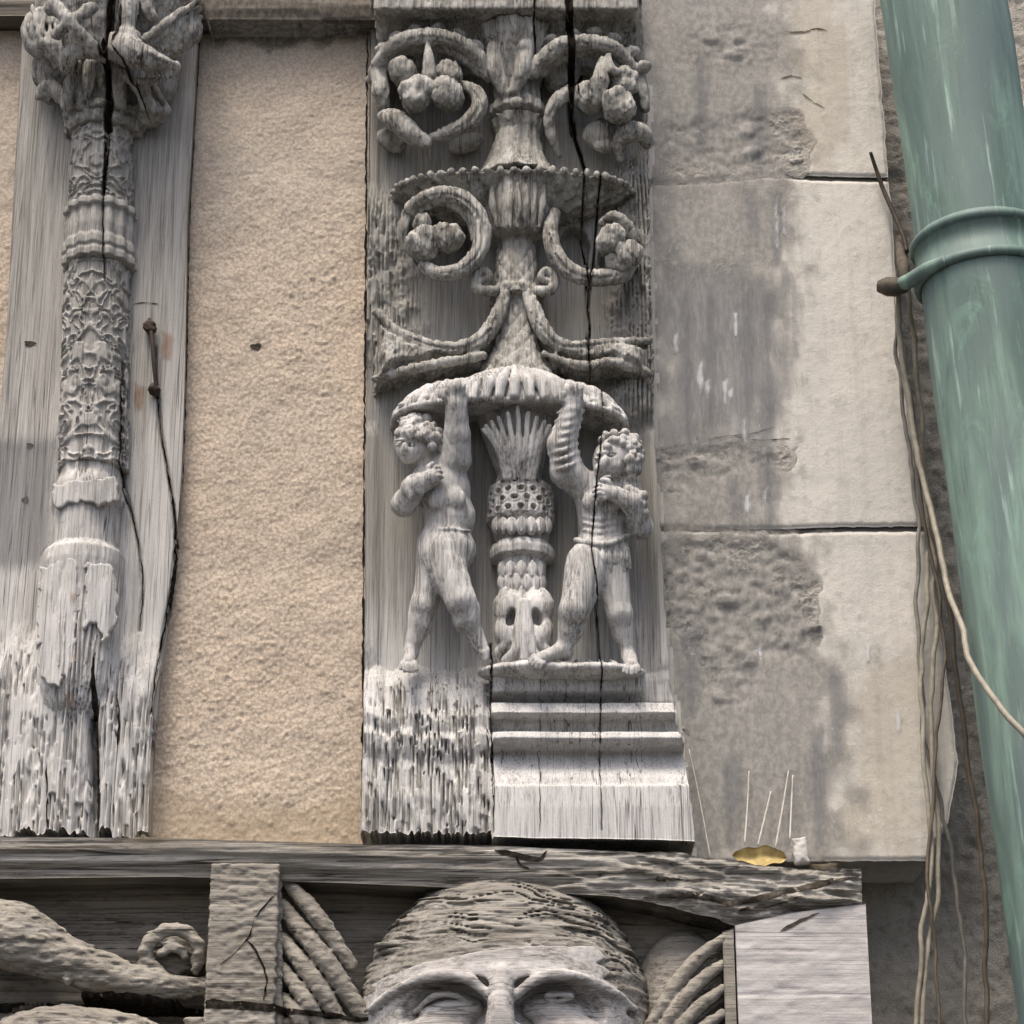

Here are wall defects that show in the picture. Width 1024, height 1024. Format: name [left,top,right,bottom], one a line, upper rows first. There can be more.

crack [98,0,149,276]
spalling [658,109,818,183]
crack [565,0,603,830]
damp [641,0,848,860]
spalling [661,530,776,687]
spalling [765,550,823,647]
crack [43,768,51,824]
crack [91,657,120,830]
crack [0,895,369,1022]